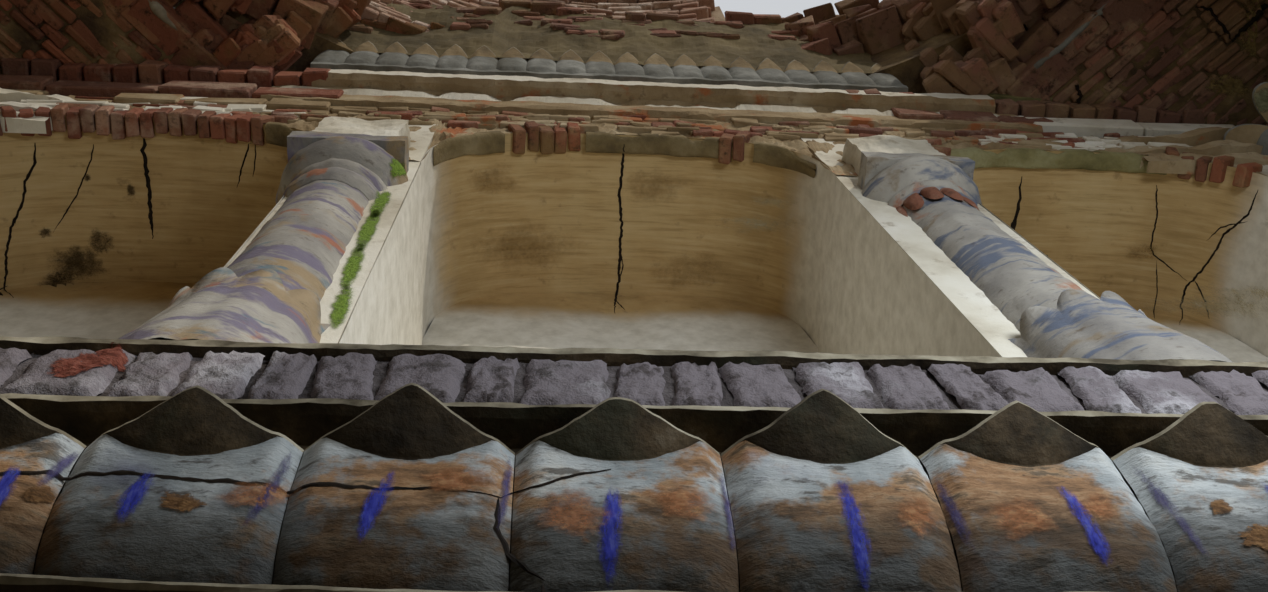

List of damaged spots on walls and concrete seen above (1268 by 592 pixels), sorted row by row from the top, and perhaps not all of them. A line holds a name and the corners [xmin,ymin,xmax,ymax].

crack [1197,3,1268,42]
crack [0,143,37,298]
crack [55,144,94,229]
damp [42,232,111,287]
crack [140,138,154,239]
crack [614,145,625,312]
crack [1011,177,1022,230]
crack [1150,185,1258,323]
crack [0,469,611,592]
rust [548,493,605,529]
rust [994,499,1048,535]